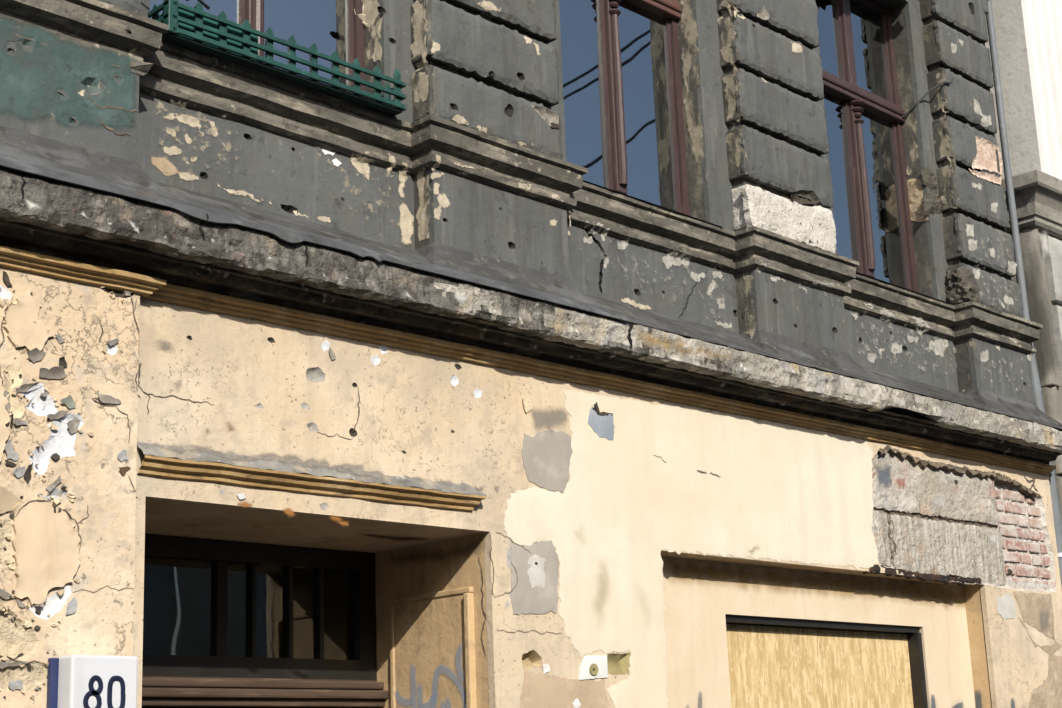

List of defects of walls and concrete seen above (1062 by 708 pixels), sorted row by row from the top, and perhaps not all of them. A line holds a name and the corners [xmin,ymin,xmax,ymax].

peeling [151,104,238,181]
spalling [969,98,1003,191]
peeling [369,154,450,244]
crack [585,229,607,293]
spalling [740,185,836,253]
spalling [4,348,84,519]
crack [92,293,214,444]
crack [319,388,360,440]
spalling [521,398,573,492]
spalling [872,445,1062,708]
spalling [0,585,78,692]
peeling [520,649,631,708]